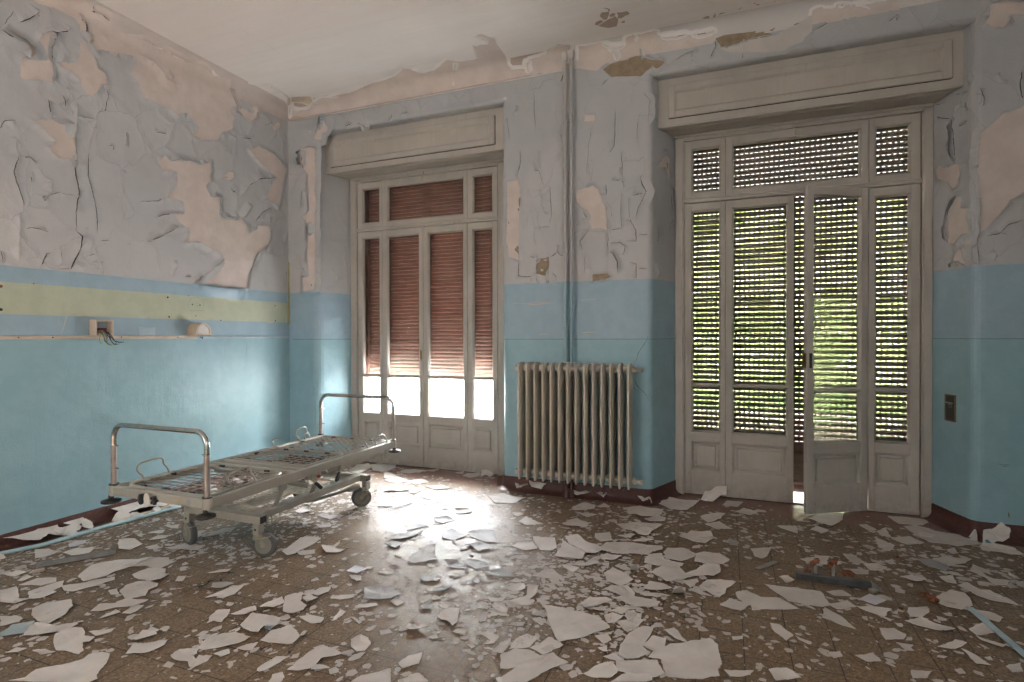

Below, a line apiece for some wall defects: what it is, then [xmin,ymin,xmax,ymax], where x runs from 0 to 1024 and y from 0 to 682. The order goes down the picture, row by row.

peeling [0,0,114,103]
peeling [974,0,1024,38]
peeling [22,109,85,169]
peeling [149,0,900,297]
peeling [933,70,1024,271]